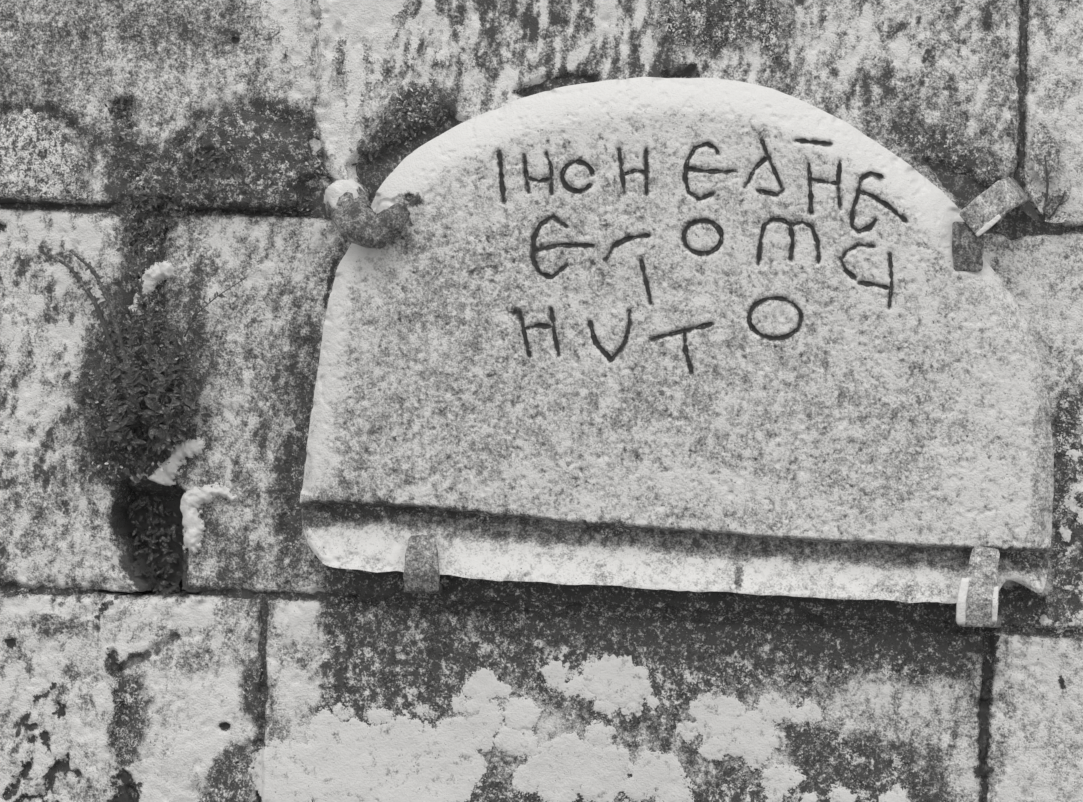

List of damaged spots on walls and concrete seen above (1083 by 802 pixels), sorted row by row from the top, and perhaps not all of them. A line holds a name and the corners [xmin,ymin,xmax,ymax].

water stain [512,84,545,97]
water stain [551,64,601,83]
water stain [646,0,802,78]
water stain [863,103,1027,205]
water stain [322,258,339,308]
water stain [275,340,534,556]
water stain [295,379,1083,802]